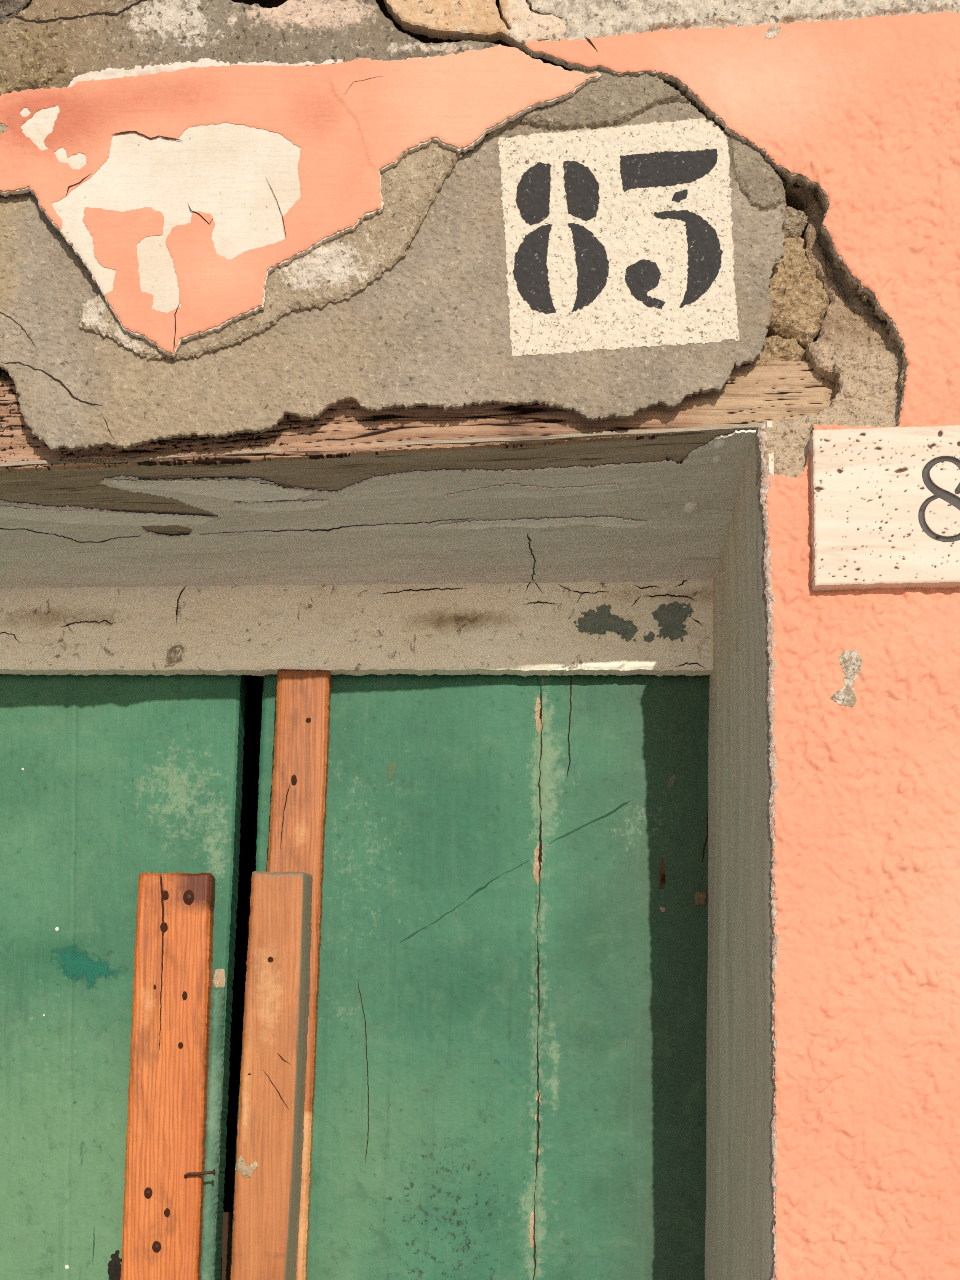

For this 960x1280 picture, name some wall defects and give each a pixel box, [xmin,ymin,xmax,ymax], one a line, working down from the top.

crack [6,0,146,23]
crack [231,0,288,8]
crack [376,0,461,43]
crack [493,0,598,71]
crack [380,587,465,595]
flaking render [0,69,907,1085]
spalling [769,1089,778,1206]
spalling [108,1250,122,1280]
spalling [769,1217,777,1280]